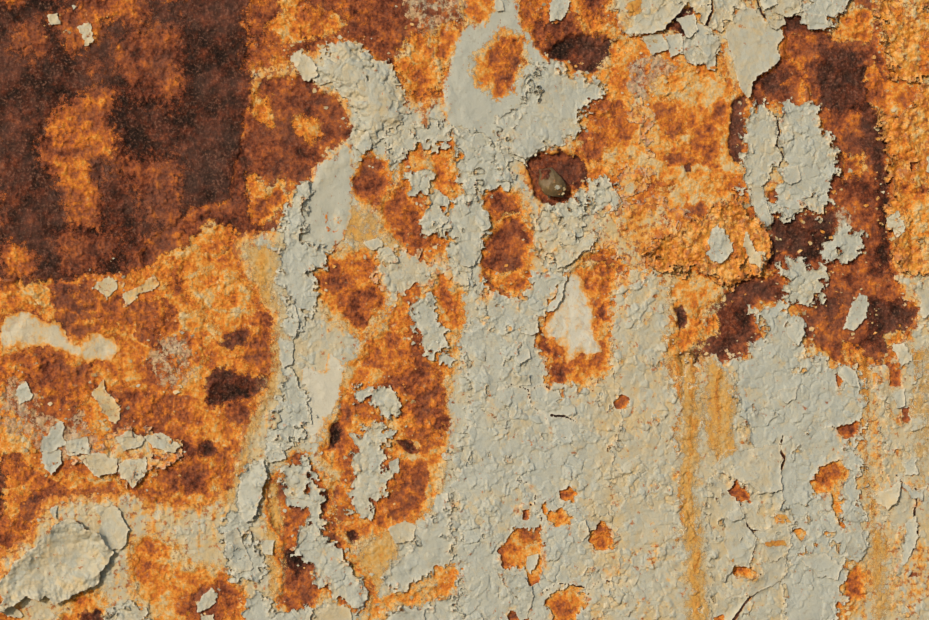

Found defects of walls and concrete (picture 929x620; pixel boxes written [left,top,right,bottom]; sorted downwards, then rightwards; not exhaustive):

peeling [0,505,130,618]
peeling [0,376,183,489]
rust [0,0,496,620]
peeling [217,144,402,620]
peeling [363,0,929,620]
rust [466,0,921,620]
rust [891,349,929,458]